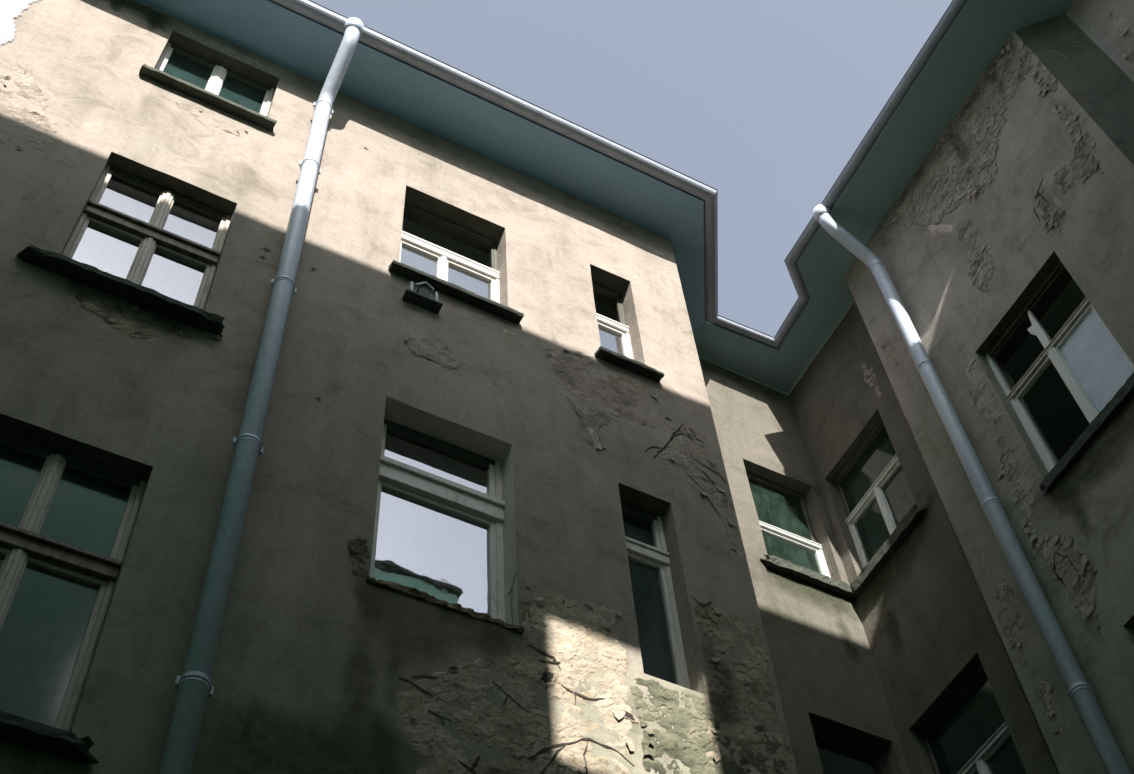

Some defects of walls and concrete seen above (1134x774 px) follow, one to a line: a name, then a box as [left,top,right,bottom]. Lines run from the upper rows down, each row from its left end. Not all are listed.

peeling [0,55,57,153]
peeling [881,37,1103,293]
peeling [544,345,744,558]
crack [645,424,727,522]
flaking render [347,535,370,580]
peeling [1020,518,1104,639]
peeling [394,579,797,774]